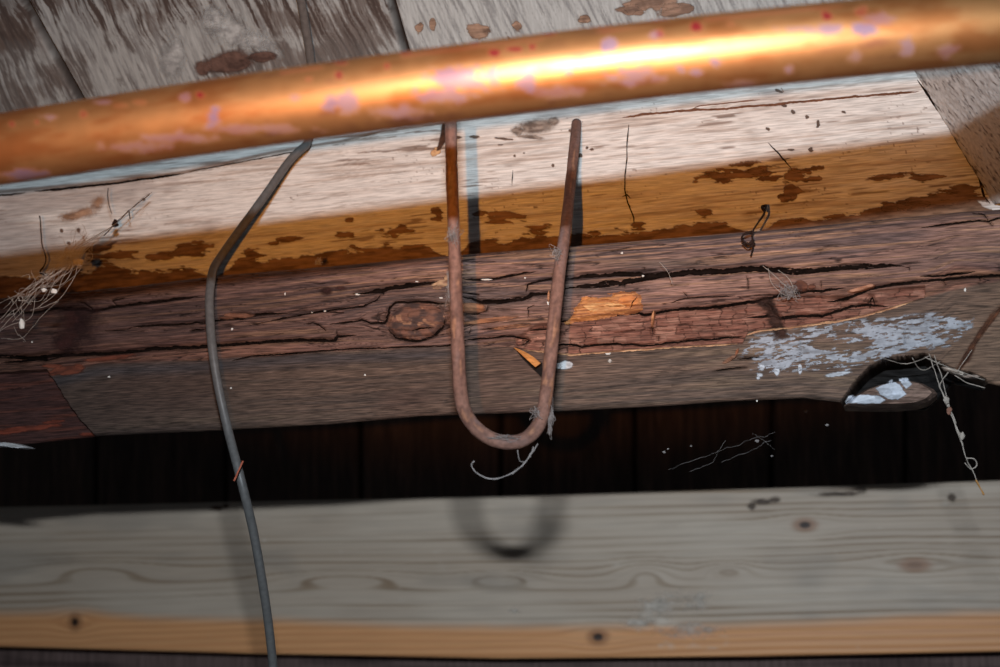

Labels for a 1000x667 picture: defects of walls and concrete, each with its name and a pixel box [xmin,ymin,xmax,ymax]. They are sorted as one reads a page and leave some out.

leakage [63,197,103,220]
crack [0,263,1000,371]
peeling [583,295,639,311]
leakage [757,297,787,339]